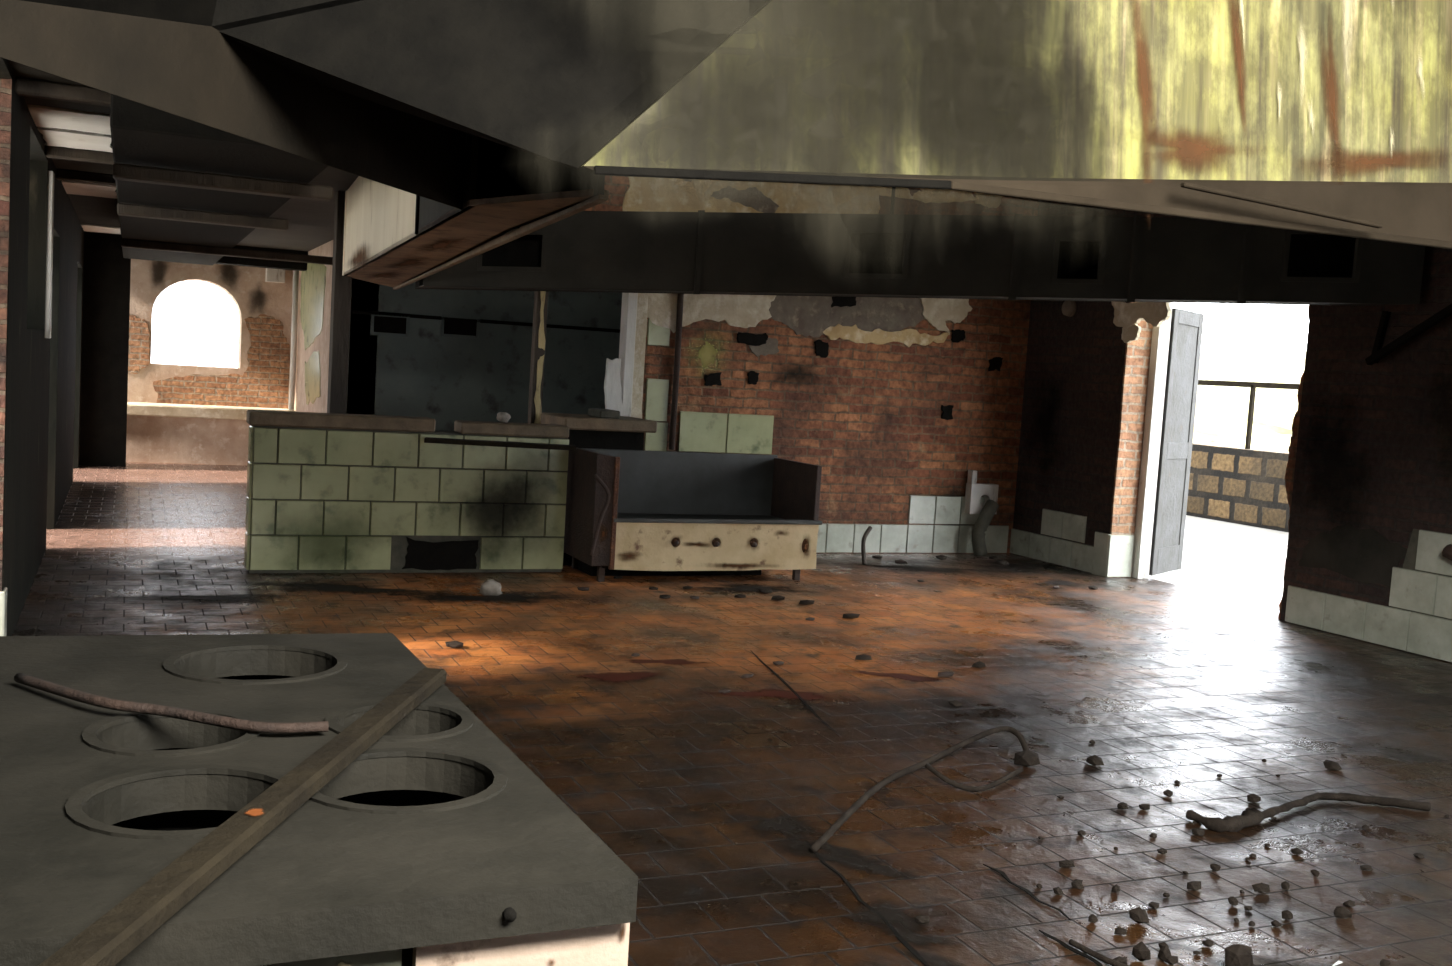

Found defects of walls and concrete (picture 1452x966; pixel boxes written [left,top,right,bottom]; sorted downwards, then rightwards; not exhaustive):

corrosion [1135,7,1230,178]
corrosion [1230,0,1245,123]
corrosion [1321,43,1431,175]
peeling [632,293,973,420]